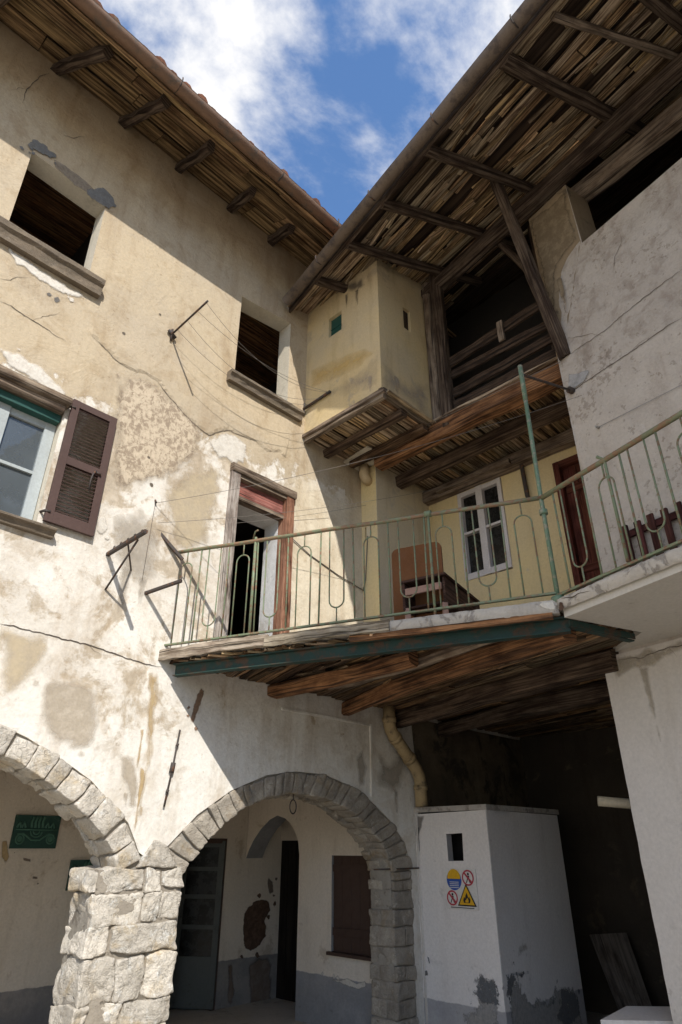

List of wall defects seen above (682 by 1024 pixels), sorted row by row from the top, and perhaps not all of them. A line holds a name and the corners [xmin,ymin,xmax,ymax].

flaking render [9,248,81,302]
crack [0,277,64,340]
crack [566,270,681,357]
flaking render [1,349,65,394]
crack [575,317,682,389]
crack [158,382,249,439]
flaking render [116,374,246,548]
crack [3,624,161,667]
spalling [240,878,277,958]
spalling [464,962,583,1024]